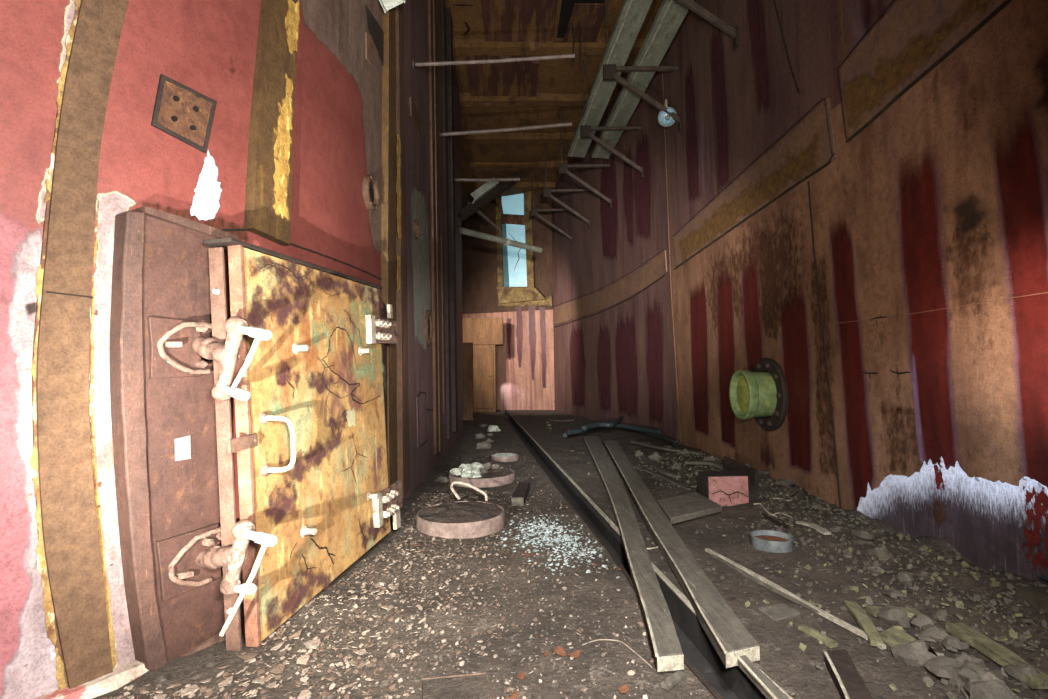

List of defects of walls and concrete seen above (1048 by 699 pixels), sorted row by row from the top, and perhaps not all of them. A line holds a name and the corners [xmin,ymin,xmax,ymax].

peeling [57,0,76,84]
corrosion [276,363,333,394]
crack [259,263,381,415]
peeling [0,168,58,699]
corrosion [265,410,353,524]
corrosion [266,569,330,630]
crack [290,538,335,580]
corrosion [360,518,389,549]
peeling [857,456,1048,585]